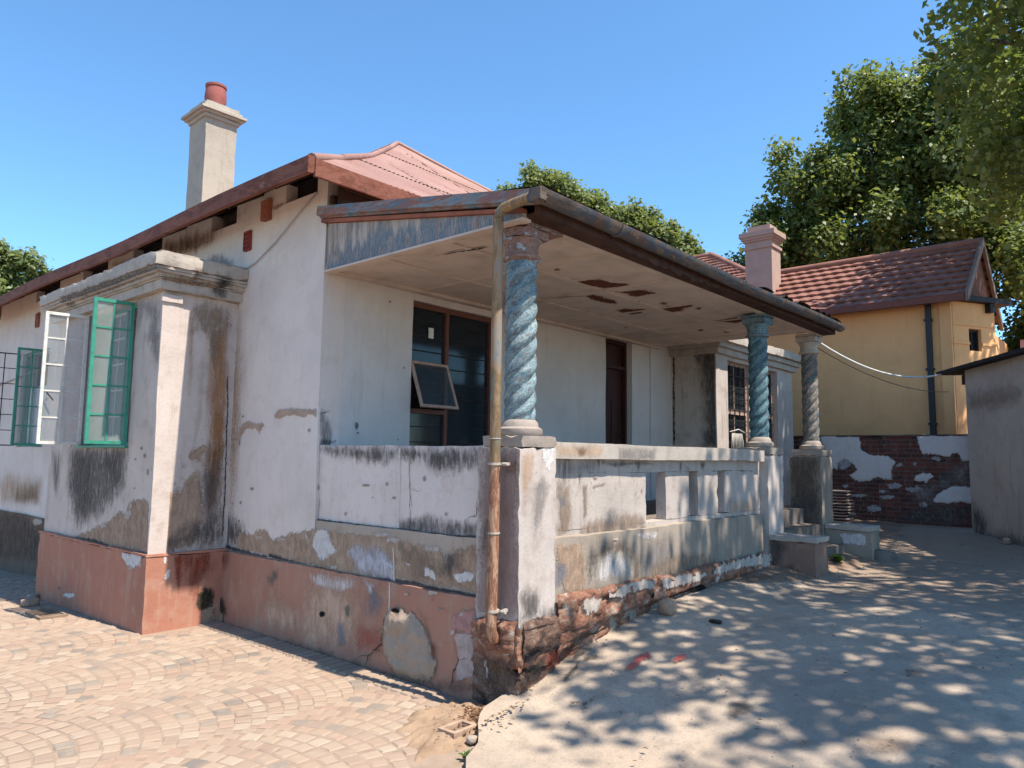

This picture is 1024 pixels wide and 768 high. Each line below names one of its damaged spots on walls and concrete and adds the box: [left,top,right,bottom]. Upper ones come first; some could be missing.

leakage [194,304,228,359]
flaking render [231,415,264,446]
flaking render [274,408,316,433]
leakage [53,448,126,522]
leakage [317,412,554,619]
leakage [791,457,822,524]
flaking render [820,435,971,515]
spalling [237,520,773,681]